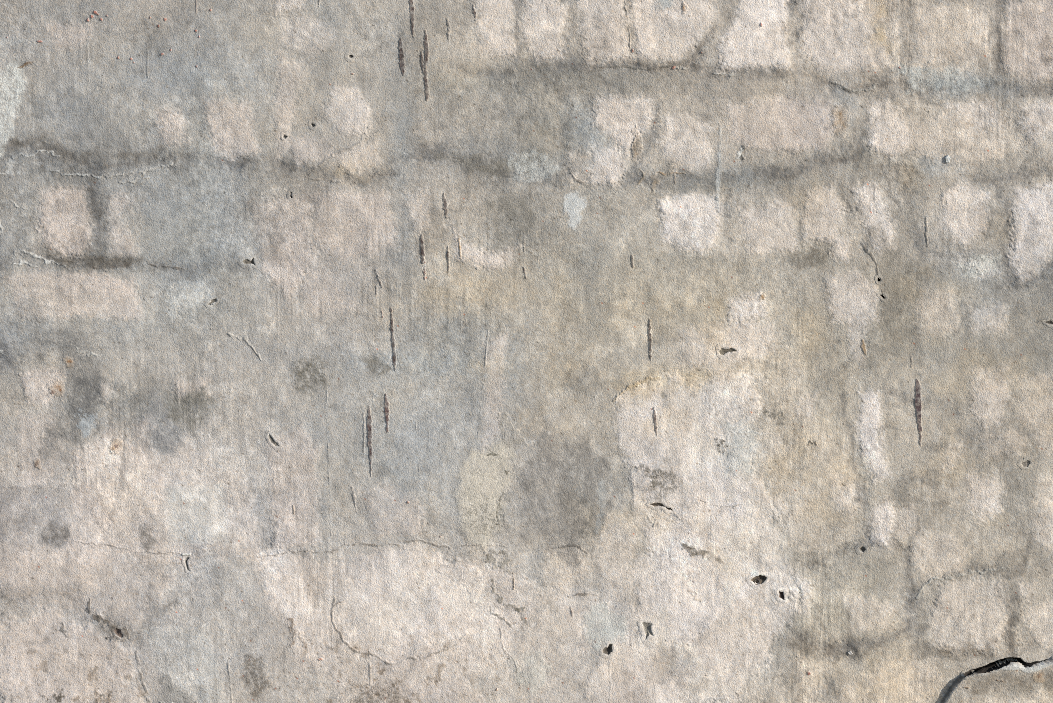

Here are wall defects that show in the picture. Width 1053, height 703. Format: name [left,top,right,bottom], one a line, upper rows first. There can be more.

damp [516,426,621,569]
crack [72,539,181,555]
crack [257,538,528,558]
crack [558,543,589,554]
crack [567,591,598,599]
spalling [746,571,788,603]
spalling [638,618,657,644]
crack [938,654,1053,703]